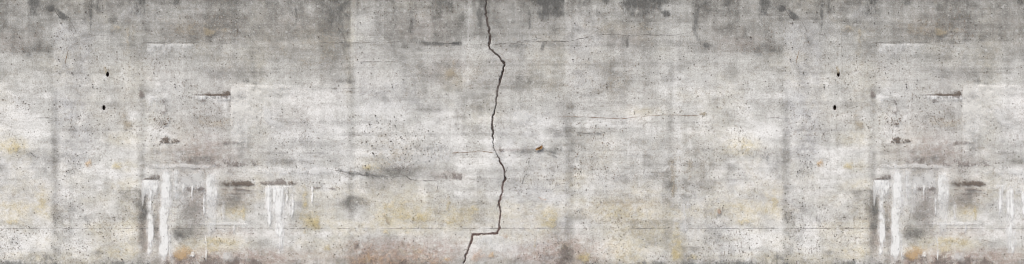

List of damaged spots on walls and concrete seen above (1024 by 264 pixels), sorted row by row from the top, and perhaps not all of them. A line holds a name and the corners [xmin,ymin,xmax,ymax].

crack [455,0,518,264]
damp [142,171,262,264]
damp [265,181,295,244]
damp [875,170,993,264]
damp [999,185,1024,251]